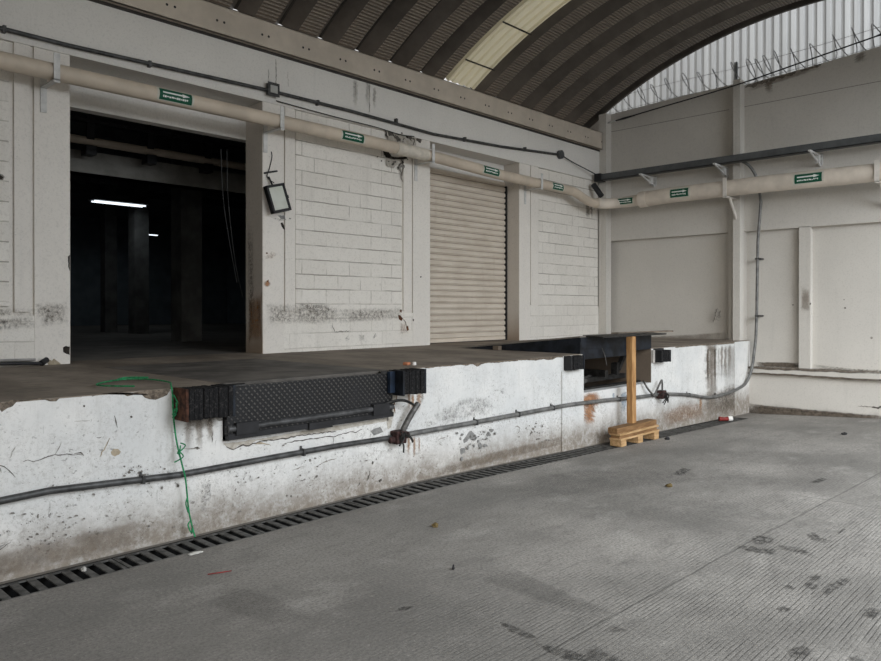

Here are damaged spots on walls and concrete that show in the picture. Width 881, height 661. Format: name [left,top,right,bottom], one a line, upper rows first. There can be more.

spalling [0,398,59,412]
spalling [94,387,170,400]
spalling [224,395,397,450]
peeling [456,421,496,461]
corrosion [584,394,598,421]
leakage [693,348,734,411]